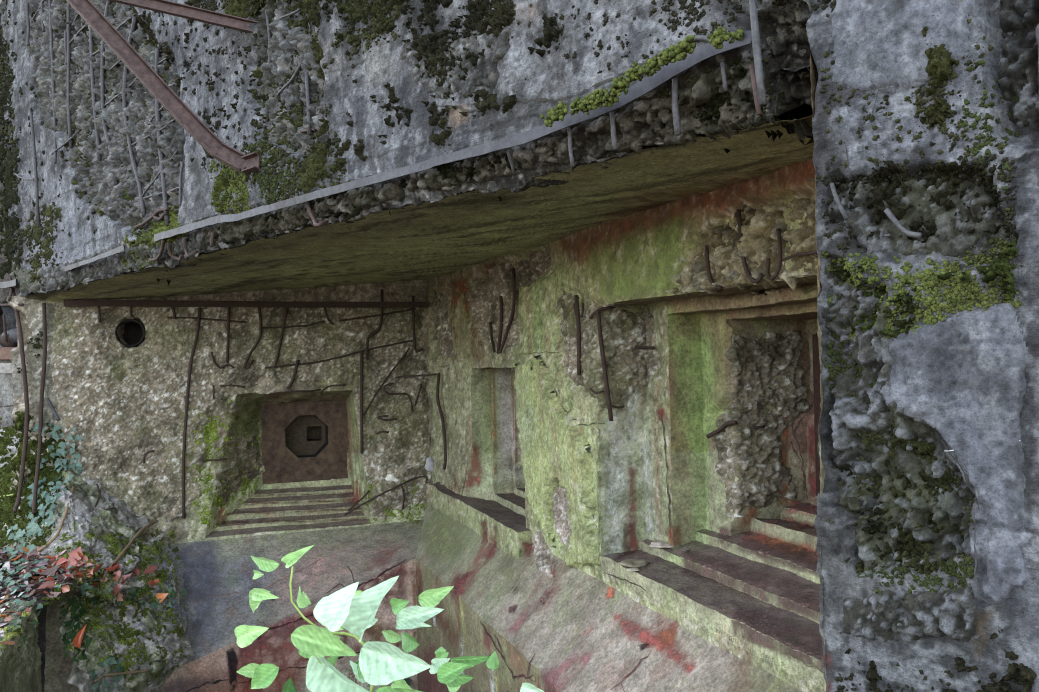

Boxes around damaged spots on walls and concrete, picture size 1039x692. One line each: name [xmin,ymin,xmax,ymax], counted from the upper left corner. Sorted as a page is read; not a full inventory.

peeling [831,0,975,91]
spalling [9,0,819,293]
spalling [557,289,659,409]
spalling [50,293,455,522]
crack [186,679,252,692]
rust [239,611,317,692]
crack [269,613,314,629]
crack [327,560,405,593]
rust [357,547,421,606]
rust [436,520,497,646]
crack [480,622,535,679]
rust [615,615,694,672]